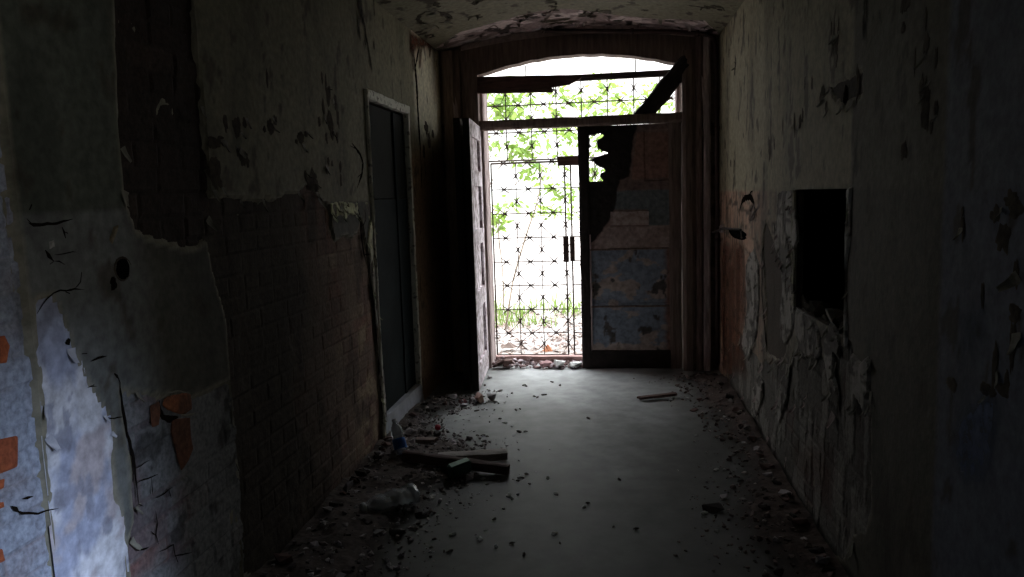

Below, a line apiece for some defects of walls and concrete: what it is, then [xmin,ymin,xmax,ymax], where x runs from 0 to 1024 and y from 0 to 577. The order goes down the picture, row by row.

peeling [415,0,725,48]
flaking render [114,0,280,247]
flaking render [804,64,863,118]
crack [27,204,83,313]
flaking render [110,256,131,291]
flaking render [304,157,390,432]
spalling [0,336,10,363]
flaking render [719,187,872,560]
spalling [0,436,18,489]
crack [82,353,192,562]
flaking render [36,296,244,577]